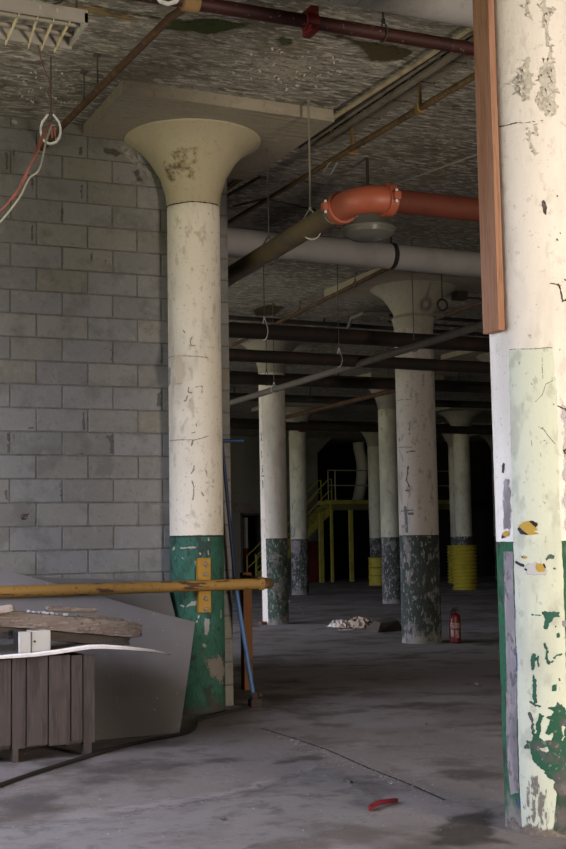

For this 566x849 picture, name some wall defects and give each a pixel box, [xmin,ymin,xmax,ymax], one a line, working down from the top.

peeling [511,0,560,117]
peeling [527,123,539,156]
peeling [504,551,566,837]